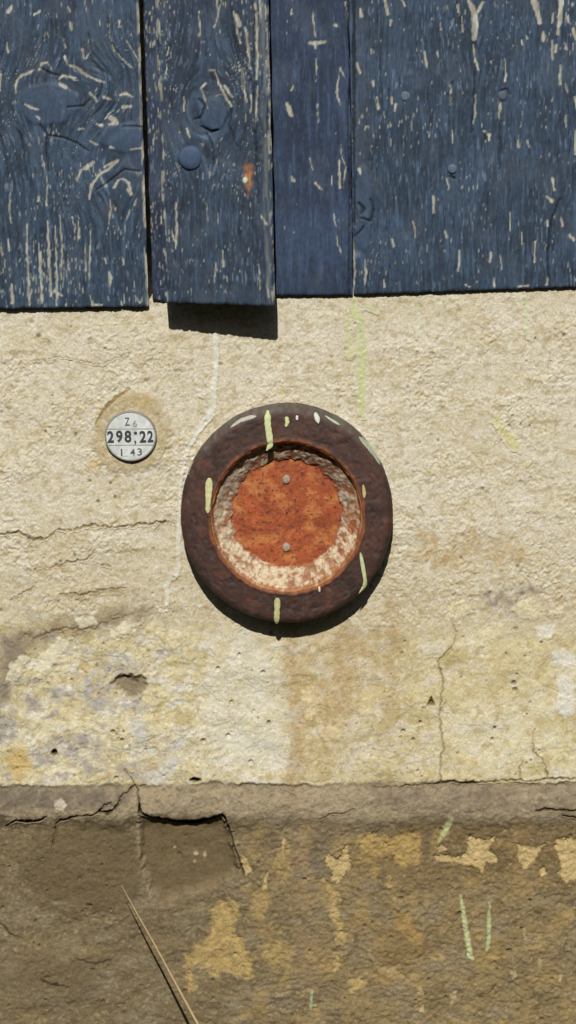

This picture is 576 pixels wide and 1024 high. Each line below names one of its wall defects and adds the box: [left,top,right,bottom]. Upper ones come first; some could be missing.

crack [0,519,176,641]
crack [371,612,576,790]
crack [5,769,245,876]
spalling [134,792,299,998]
peeling [322,829,499,995]
peeling [515,835,576,884]